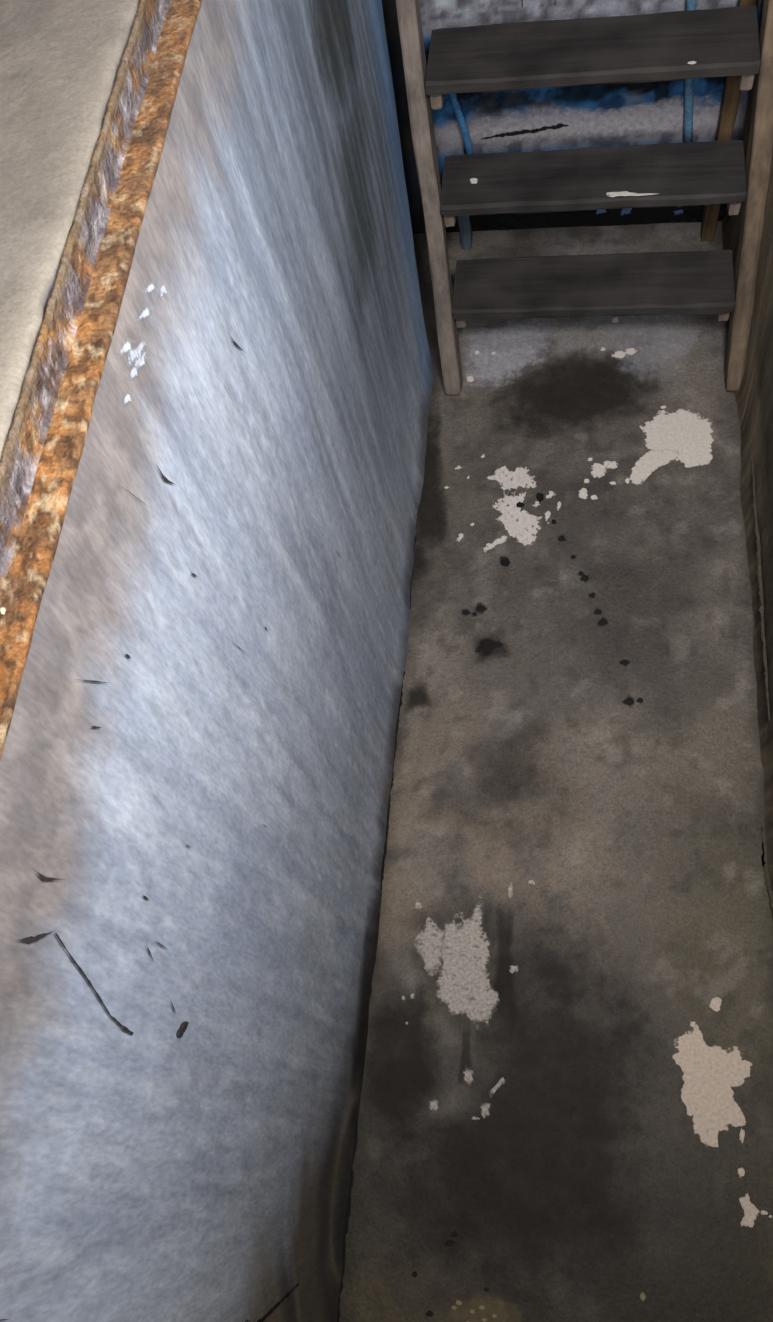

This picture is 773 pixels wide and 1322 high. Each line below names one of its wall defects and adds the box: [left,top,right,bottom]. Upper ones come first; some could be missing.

damp [465,321,644,431]
peeling [579,406,716,500]
crack [410,507,419,609]
peeling [483,466,561,567]
crack [381,653,407,897]
peeling [414,896,499,1024]
peeling [709,997,722,1012]
peeling [472,1077,505,1120]
peeling [673,1021,752,1147]
crack [337,986,372,1322]
crack [245,1283,299,1322]